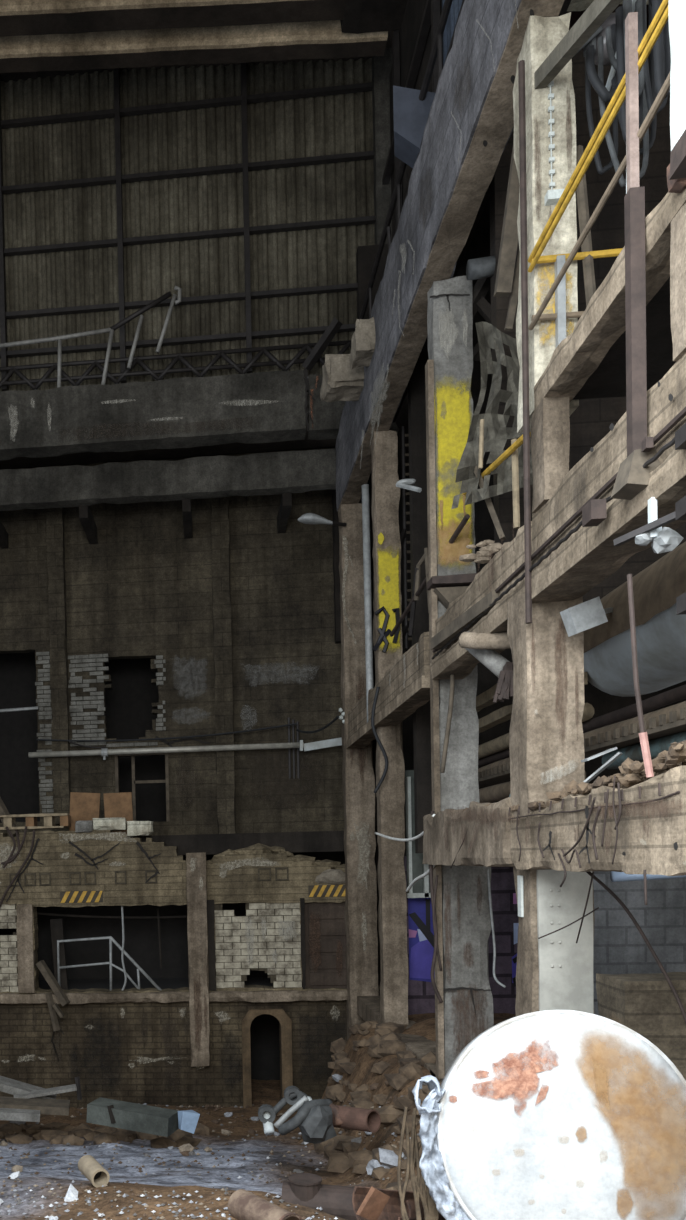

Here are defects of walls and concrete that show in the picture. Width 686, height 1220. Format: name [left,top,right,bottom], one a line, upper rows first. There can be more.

spalling [35,652,54,814]
spalling [68,654,206,747]